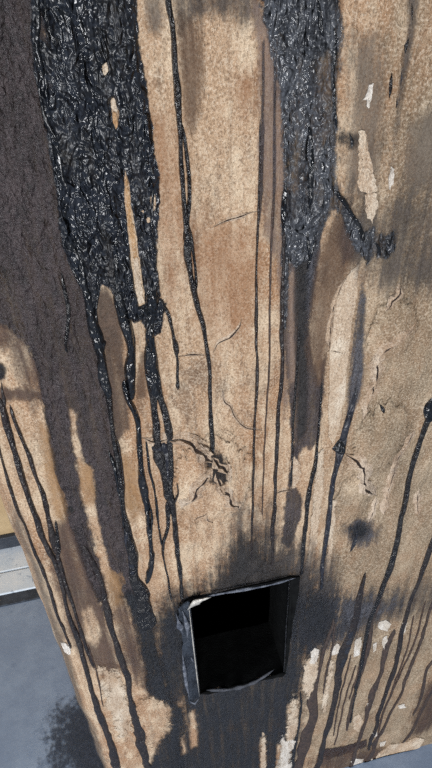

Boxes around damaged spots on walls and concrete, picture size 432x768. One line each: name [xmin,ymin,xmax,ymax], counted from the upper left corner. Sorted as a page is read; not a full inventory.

spalling [356,130,379,224]
water stain [229,41,432,768]
crack [142,431,244,523]
water stain [0,289,185,768]
spalling [353,637,362,657]
spalling [373,619,391,652]
spalling [353,714,364,732]
spalling [351,733,424,765]